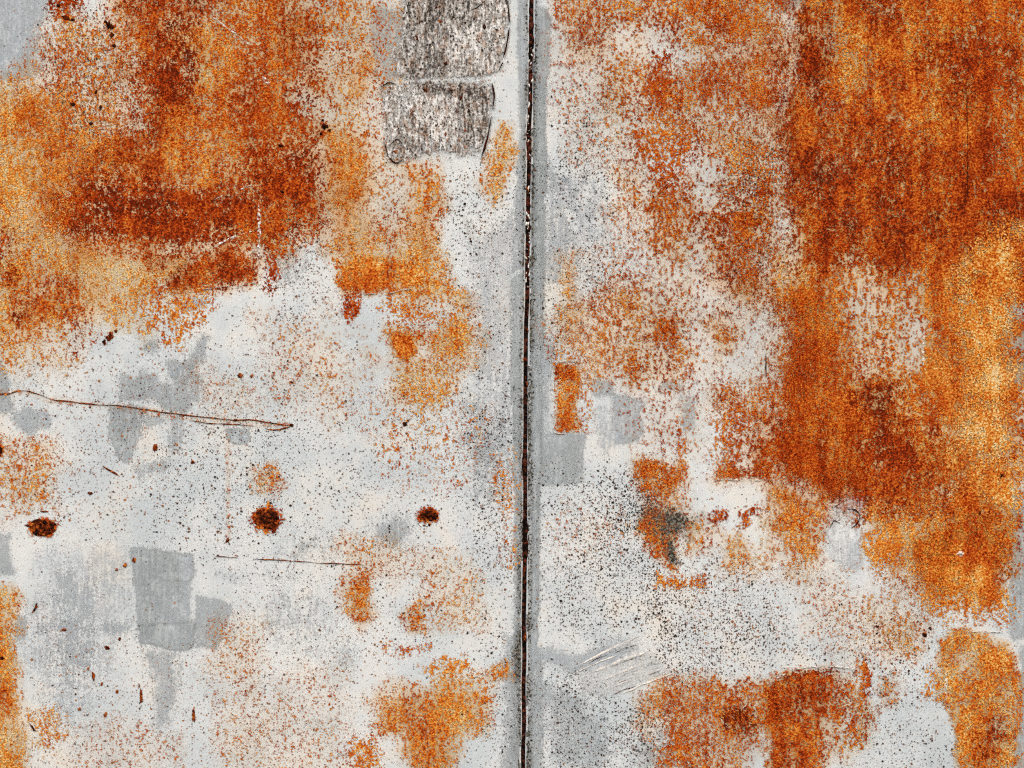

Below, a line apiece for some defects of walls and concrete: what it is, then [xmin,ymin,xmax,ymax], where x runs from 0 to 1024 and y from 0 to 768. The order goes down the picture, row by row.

rust [0,581,187,768]
rust [0,0,526,583]
rust [200,530,525,768]
rust [527,0,1024,768]